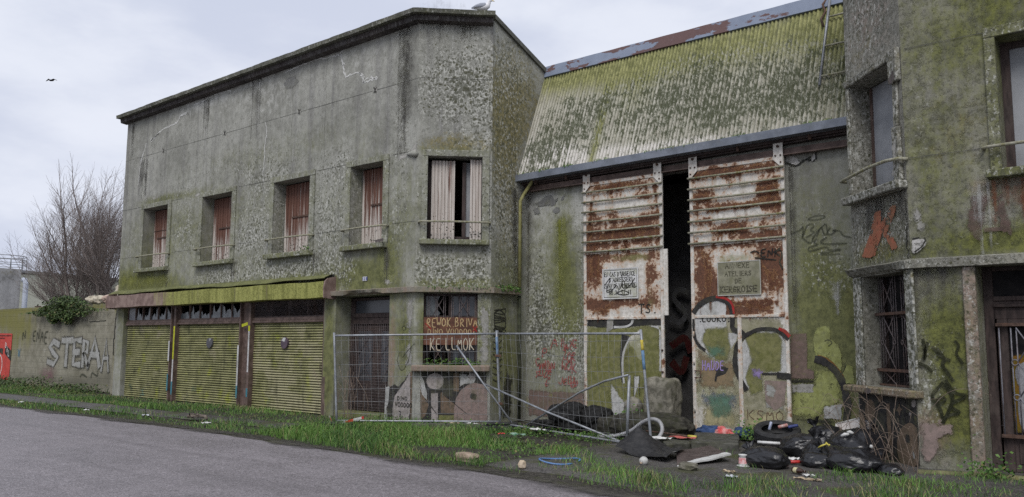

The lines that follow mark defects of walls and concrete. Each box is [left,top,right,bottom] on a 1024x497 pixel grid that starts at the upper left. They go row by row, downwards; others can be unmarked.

crack [285,50,378,84]
crack [138,90,231,184]
rust [586,181,660,283]
rust [693,161,781,240]
rust [731,265,782,318]
flaking render [919,419,953,462]